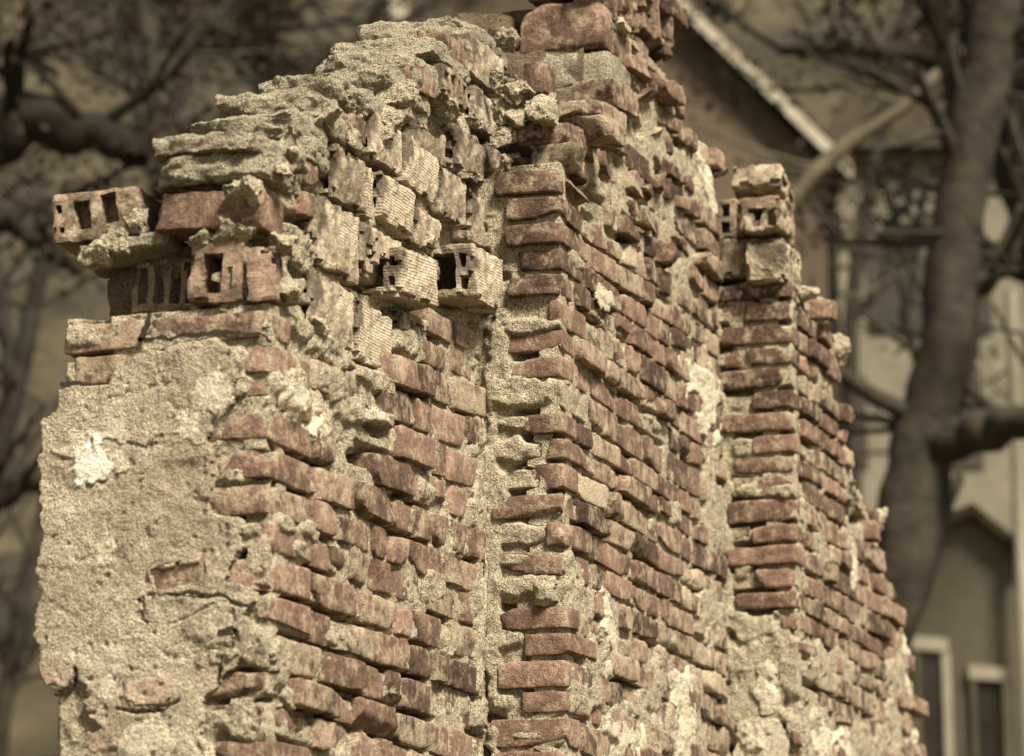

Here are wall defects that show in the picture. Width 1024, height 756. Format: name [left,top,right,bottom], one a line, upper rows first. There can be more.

peeling [678,355,724,447]
spalling [138,553,211,625]
crack [152,593,254,678]
peeling [733,660,790,756]